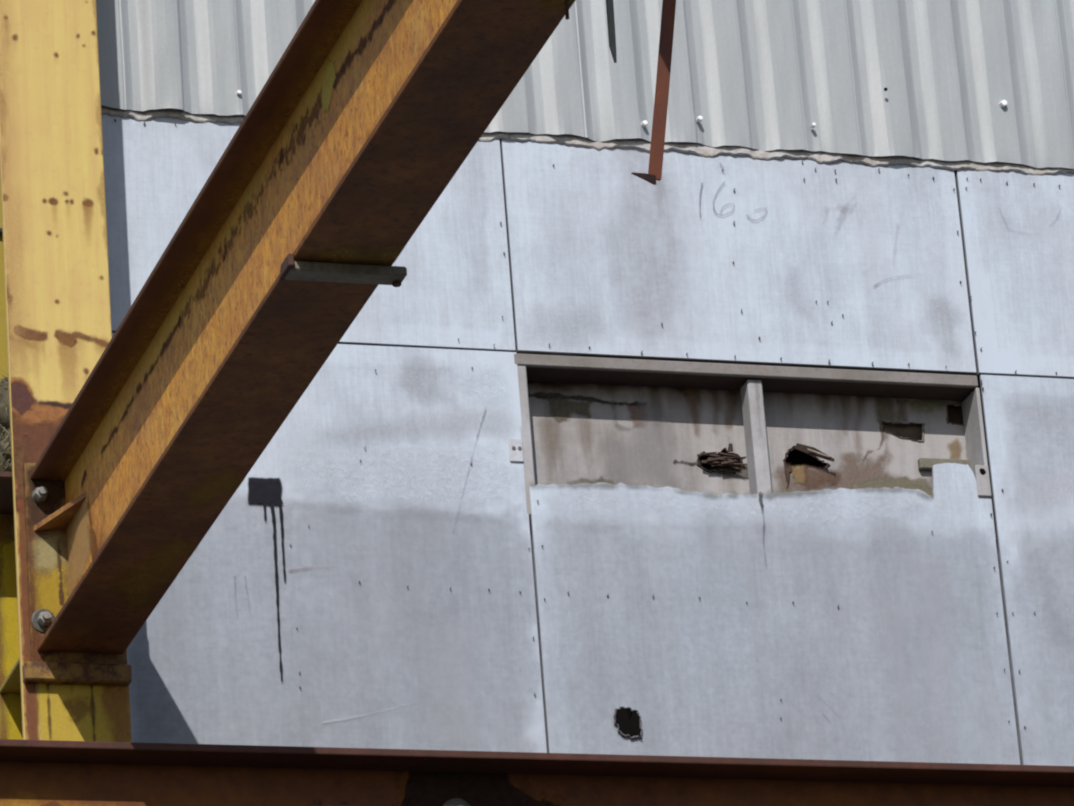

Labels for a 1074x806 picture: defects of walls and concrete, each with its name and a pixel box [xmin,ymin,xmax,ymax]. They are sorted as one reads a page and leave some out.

corrosion [244,0,395,218]
corrosion [43,192,93,211]
corrosion [14,325,108,347]
corrosion [101,231,235,454]
spalling [879,420,925,443]
spalling [946,403,964,426]
spalling [673,443,748,477]
spalling [783,443,839,489]
corrosion [87,501,98,559]
corrosion [393,771,560,806]